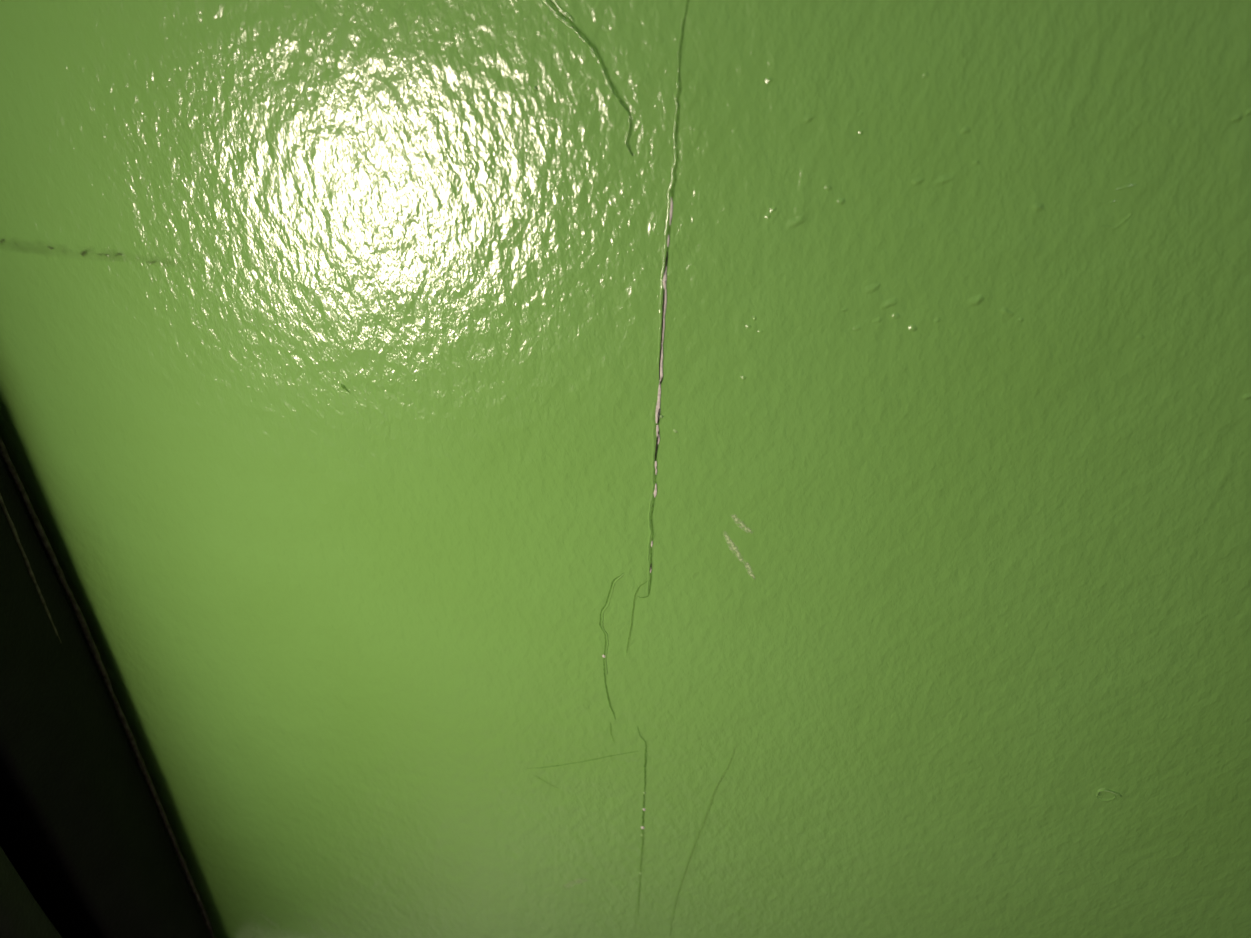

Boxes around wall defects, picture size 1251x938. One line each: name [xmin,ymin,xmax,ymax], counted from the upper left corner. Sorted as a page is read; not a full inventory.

crack [543,0,634,156]
crack [599,0,689,915]